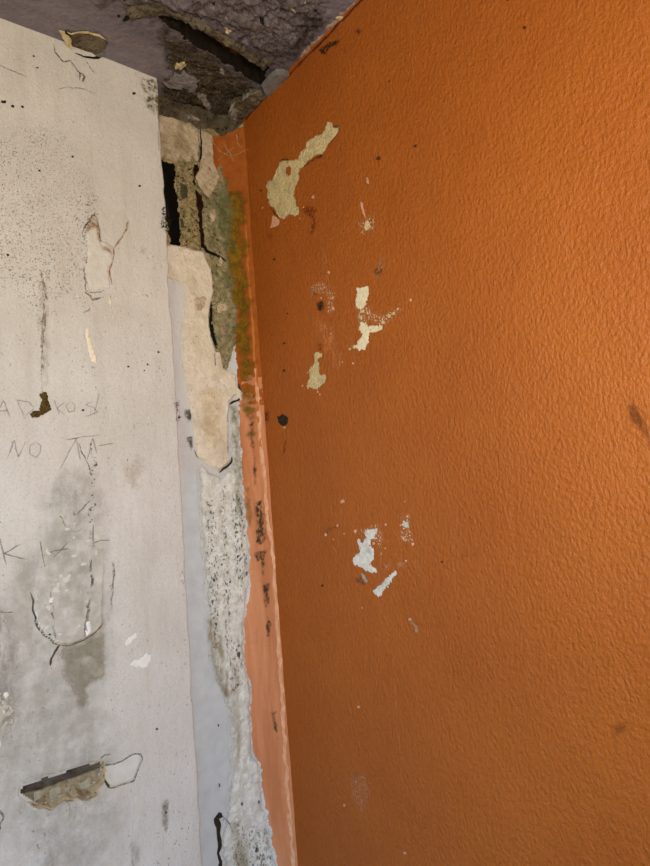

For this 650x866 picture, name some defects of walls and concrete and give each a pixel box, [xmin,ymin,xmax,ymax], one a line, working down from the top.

peeling [59,30,108,59]
spalling [162,30,289,121]
spalling [193,0,355,58]
peeling [262,122,339,233]
peeling [158,115,243,473]
peeling [349,286,399,351]
peeling [302,352,326,395]
peeling [337,523,407,597]
spalling [18,761,106,814]